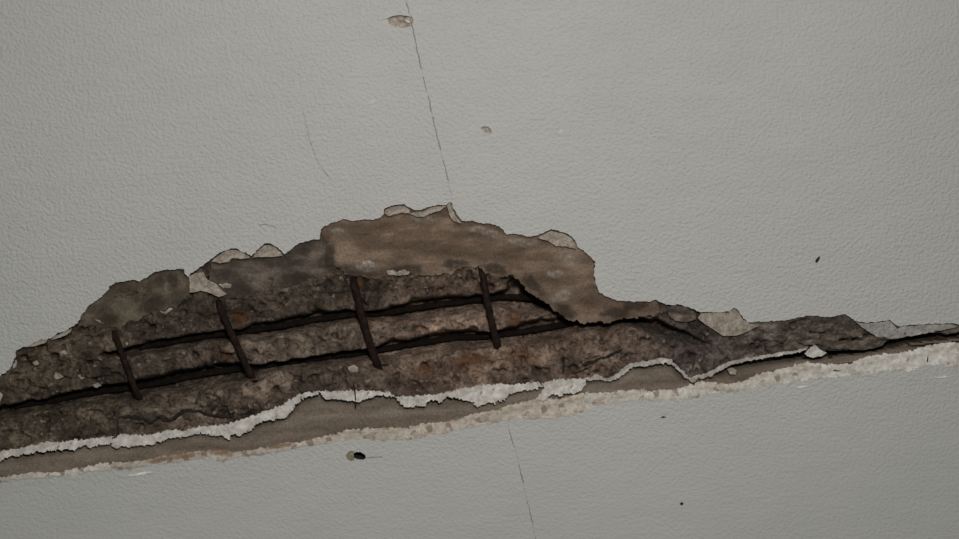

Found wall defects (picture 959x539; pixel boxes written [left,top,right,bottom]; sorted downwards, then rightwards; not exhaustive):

peeling [382,12,413,28]
crack [406,2,452,195]
spalling [0,202,959,482]
crack [508,427,536,539]